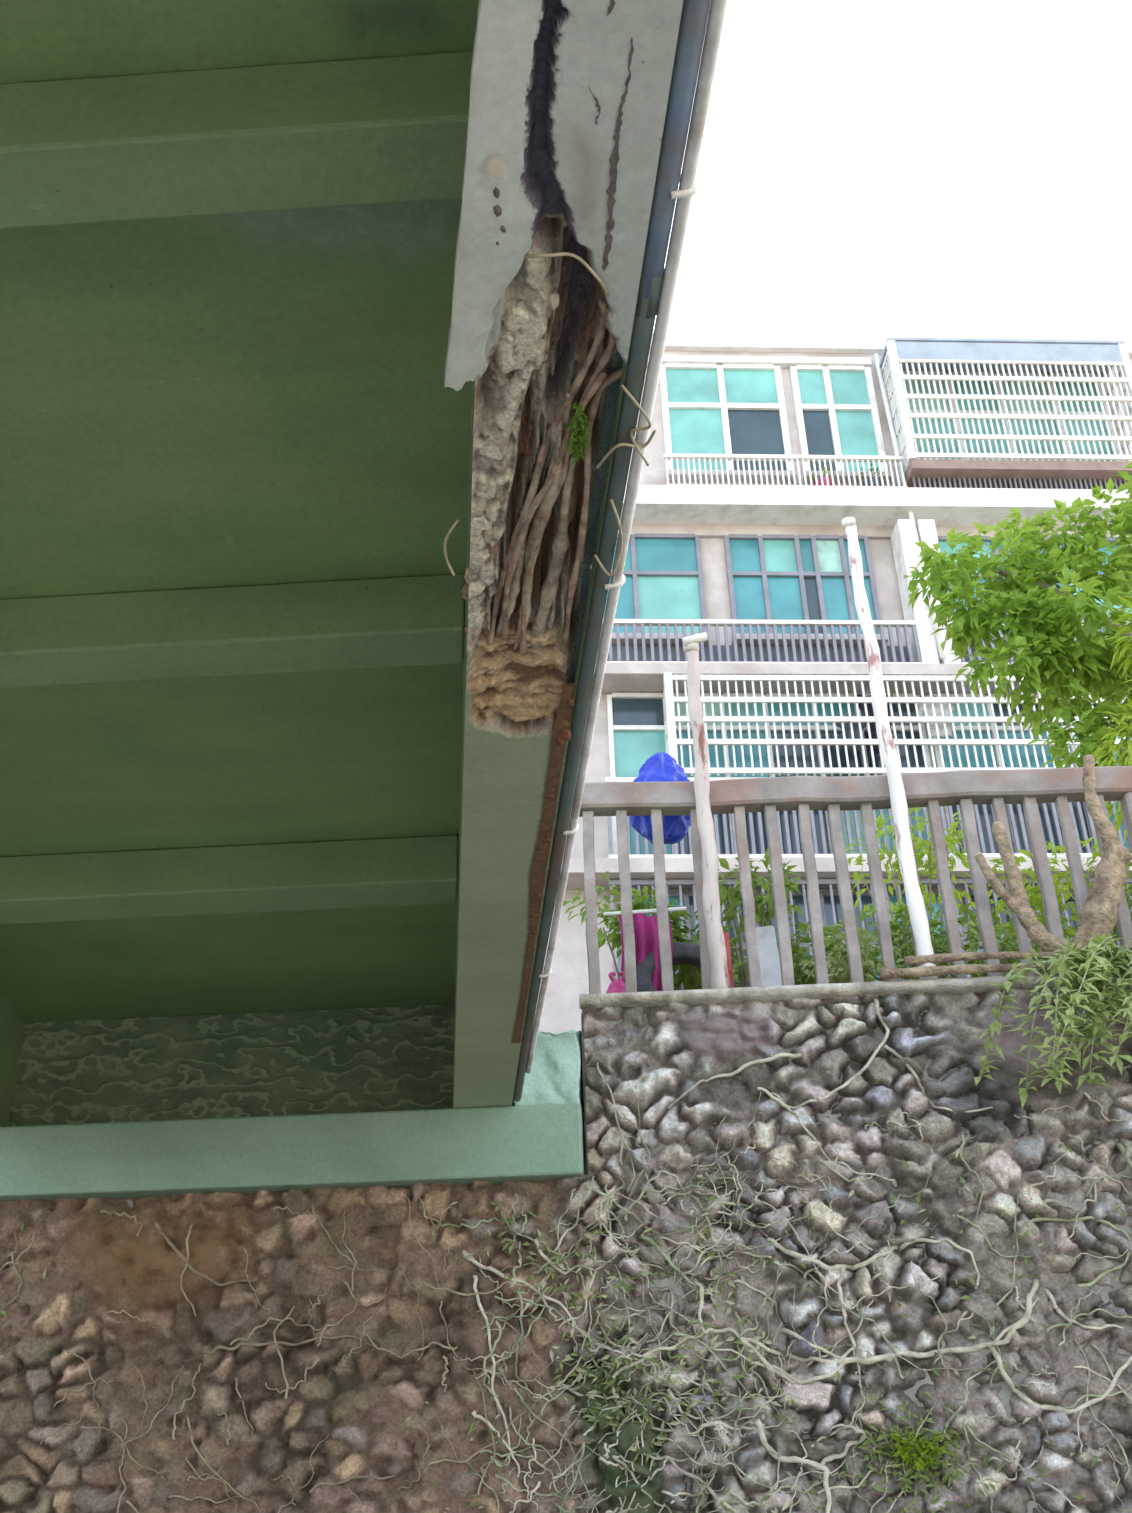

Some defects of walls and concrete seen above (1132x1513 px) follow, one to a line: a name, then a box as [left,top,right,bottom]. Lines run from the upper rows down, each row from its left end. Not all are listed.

crack [519,0,634,270]
spalling [443,187,656,743]